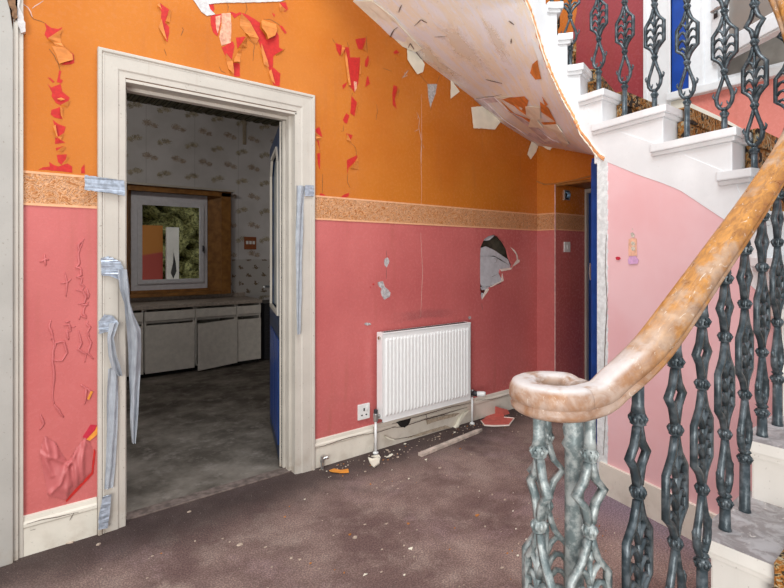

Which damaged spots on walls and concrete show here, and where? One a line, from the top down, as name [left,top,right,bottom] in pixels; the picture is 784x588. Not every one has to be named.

peeling [157,3,171,56]
peeling [194,0,288,86]
peeling [7,0,85,173]
peeling [333,36,370,198]
flaking render [370,252,390,300]
spalling [480,235,520,310]